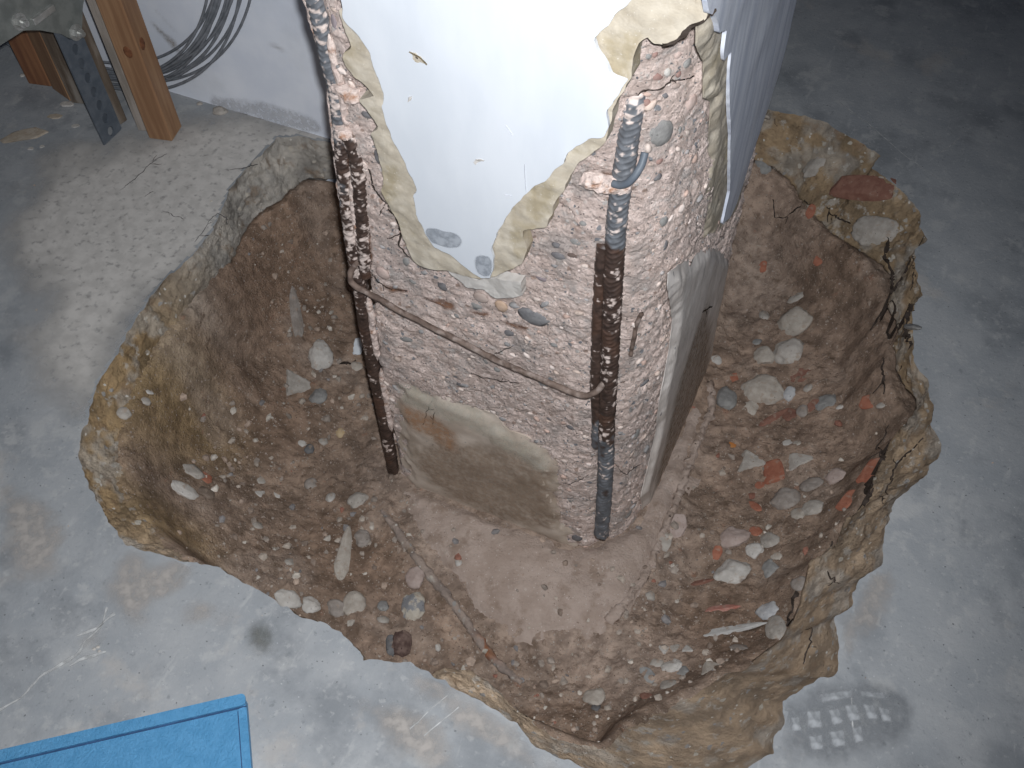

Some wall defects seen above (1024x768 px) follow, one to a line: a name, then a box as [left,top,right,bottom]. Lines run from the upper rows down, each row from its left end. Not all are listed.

spalling [78,0,756,562]
crack [870,236,926,410]
spalling [431,109,941,768]
crack [857,425,924,511]
crack [786,591,813,664]
crack [827,541,840,586]